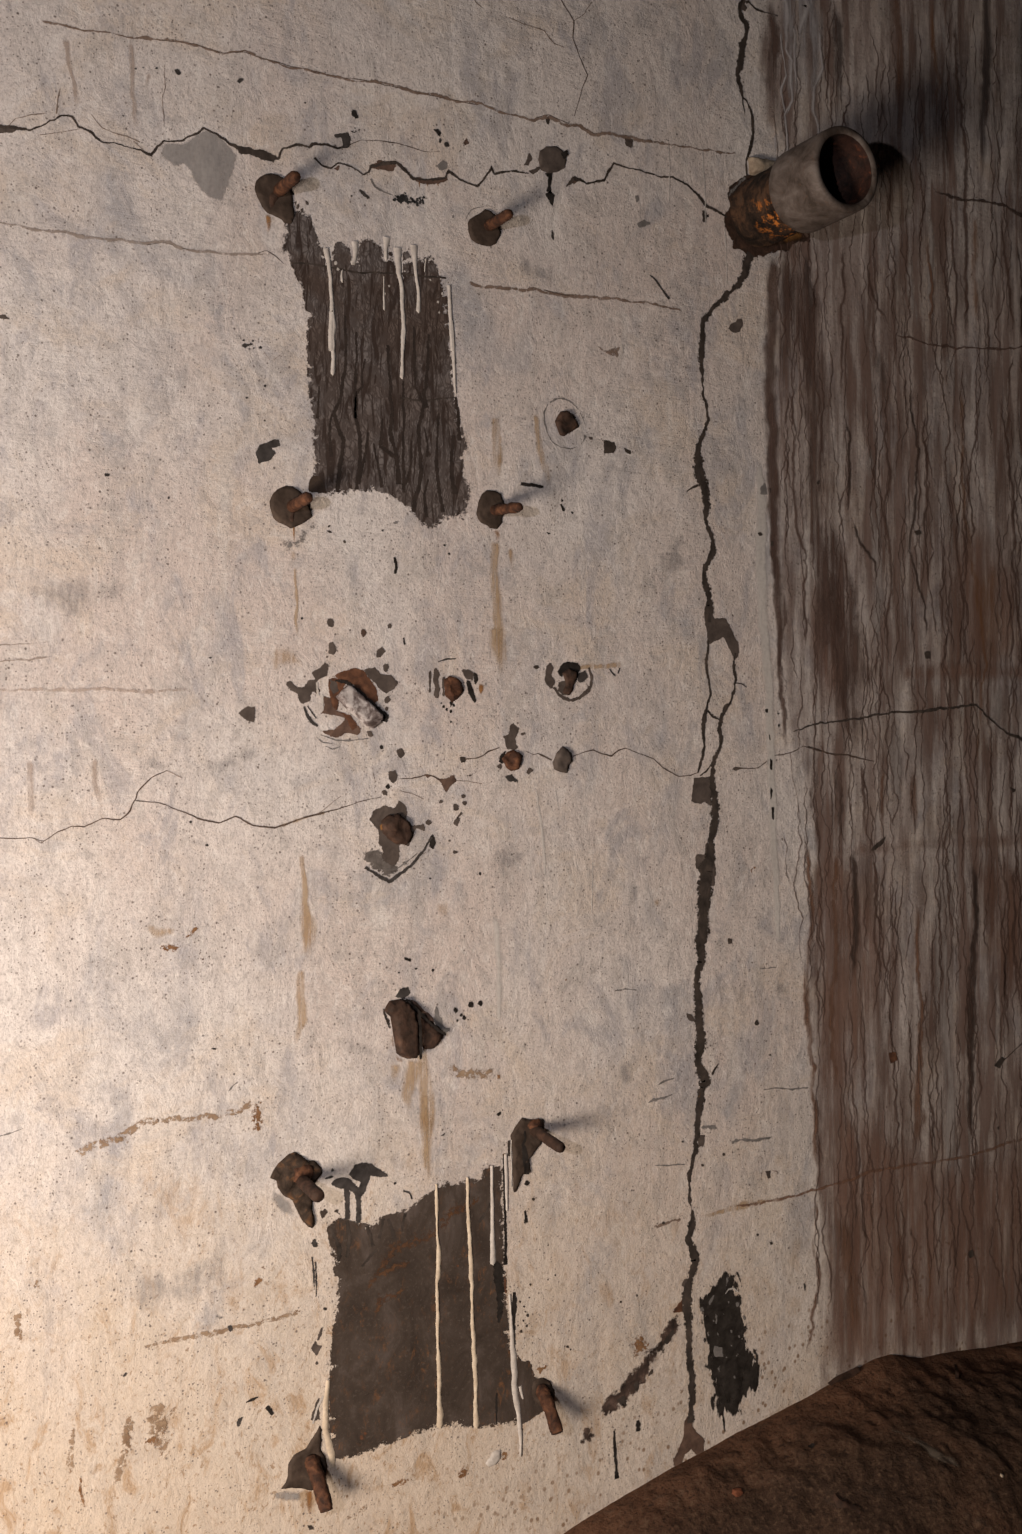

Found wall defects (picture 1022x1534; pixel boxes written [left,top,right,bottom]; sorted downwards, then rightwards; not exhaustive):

crack [0,40,529,187]
crack [474,0,593,133]
crack [566,162,727,218]
crack [735,0,778,177]
peeling [282,201,470,531]
leakage [756,0,1022,1373]
crack [0,251,1022,1466]
peeling [311,1131,556,1468]